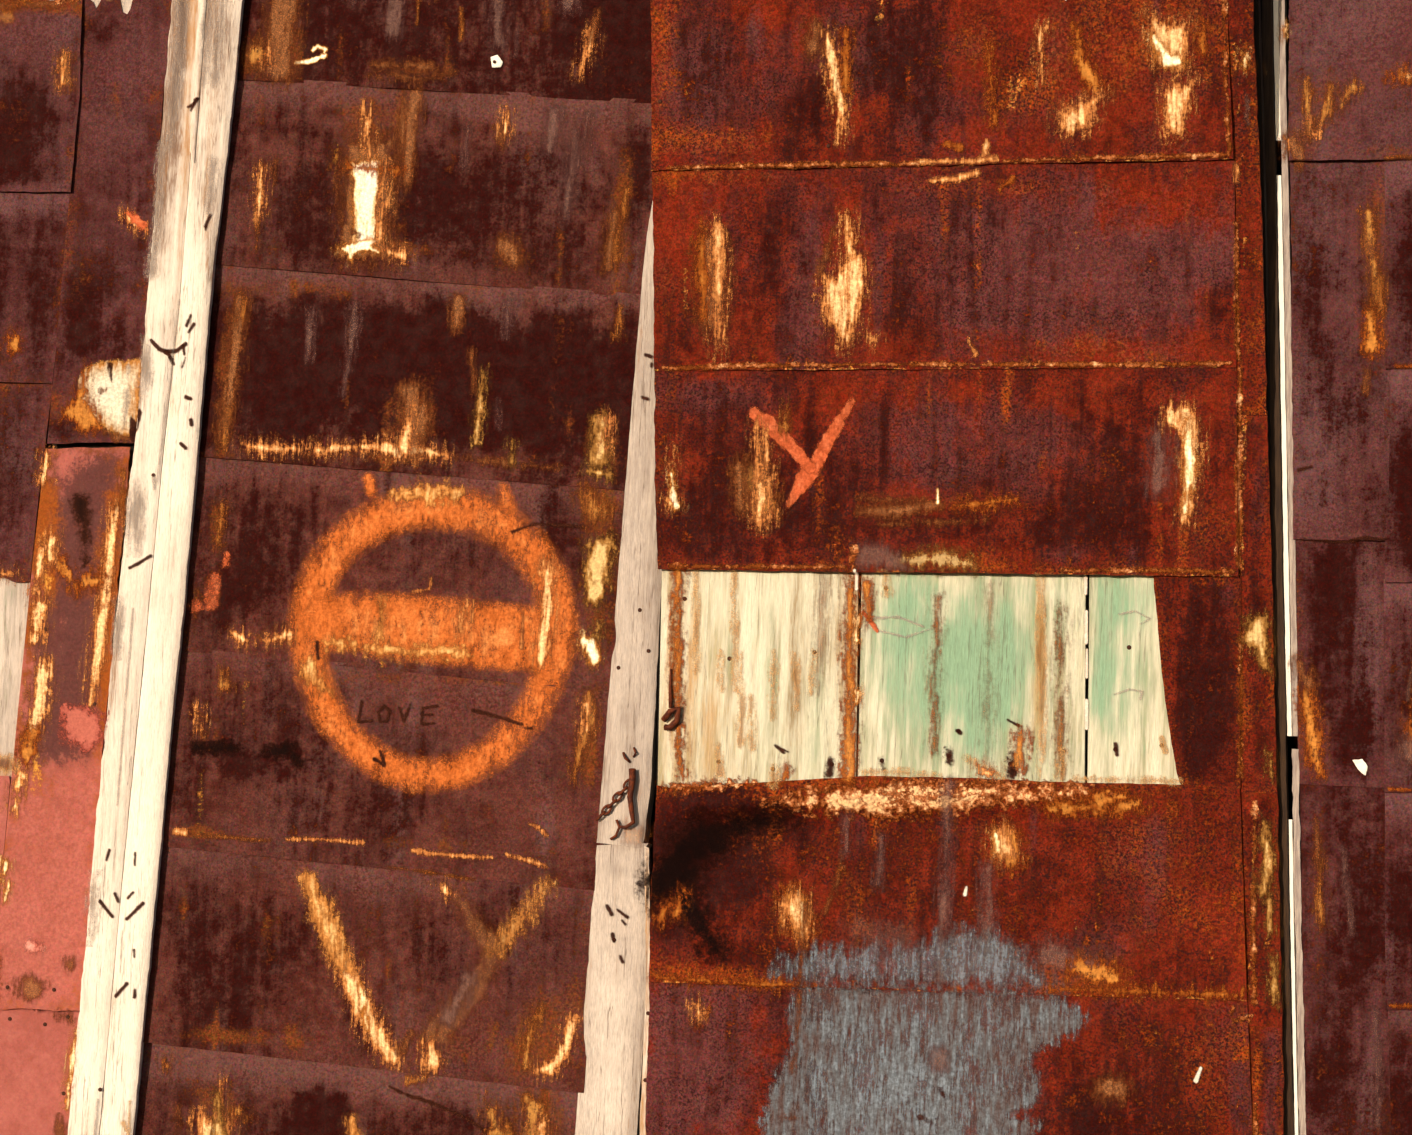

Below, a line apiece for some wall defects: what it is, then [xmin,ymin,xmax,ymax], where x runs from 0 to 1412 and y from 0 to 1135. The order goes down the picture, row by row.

corrosion [666,0,1240,192]
corrosion [252,157,278,252]
corrosion [212,289,560,471]
corrosion [660,213,1244,575]
corrosion [1356,204,1412,396]
corrosion [82,468,129,713]
corrosion [227,625,298,648]
corrosion [1288,653,1328,780]
corrosion [393,848,547,881]
corrosion [773,850,846,948]
corrosion [985,819,1030,878]
corrosion [1043,800,1259,1024]